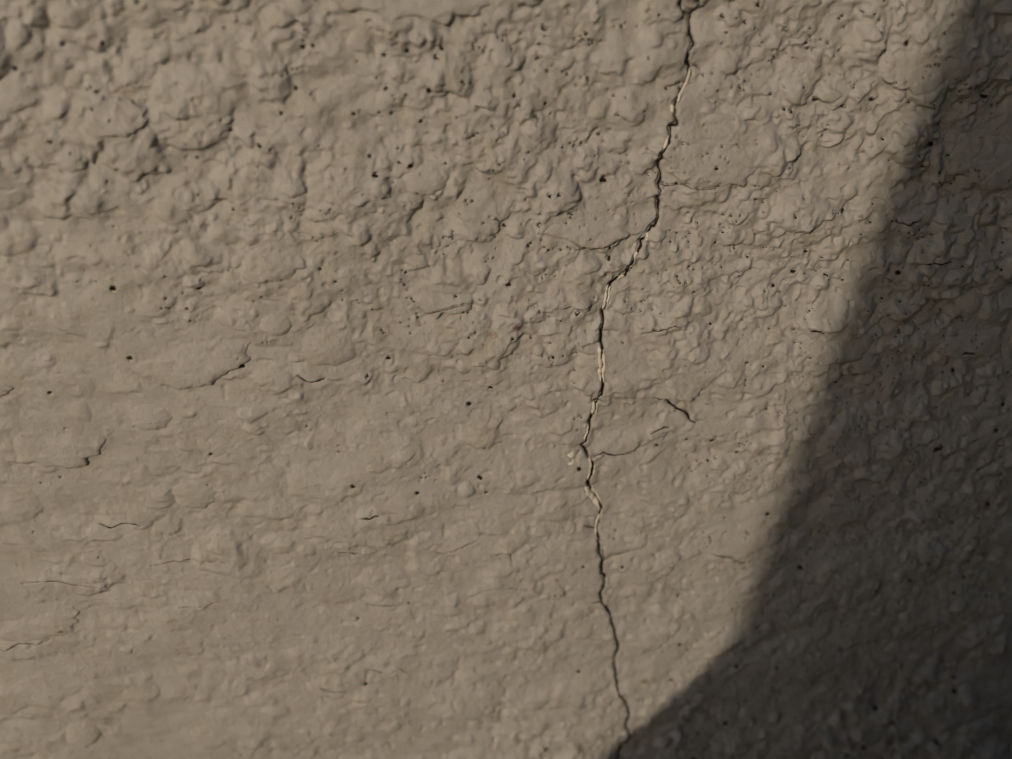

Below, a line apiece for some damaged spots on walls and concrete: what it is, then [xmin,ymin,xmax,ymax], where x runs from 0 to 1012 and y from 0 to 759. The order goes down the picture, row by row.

crack [557,0,718,759]